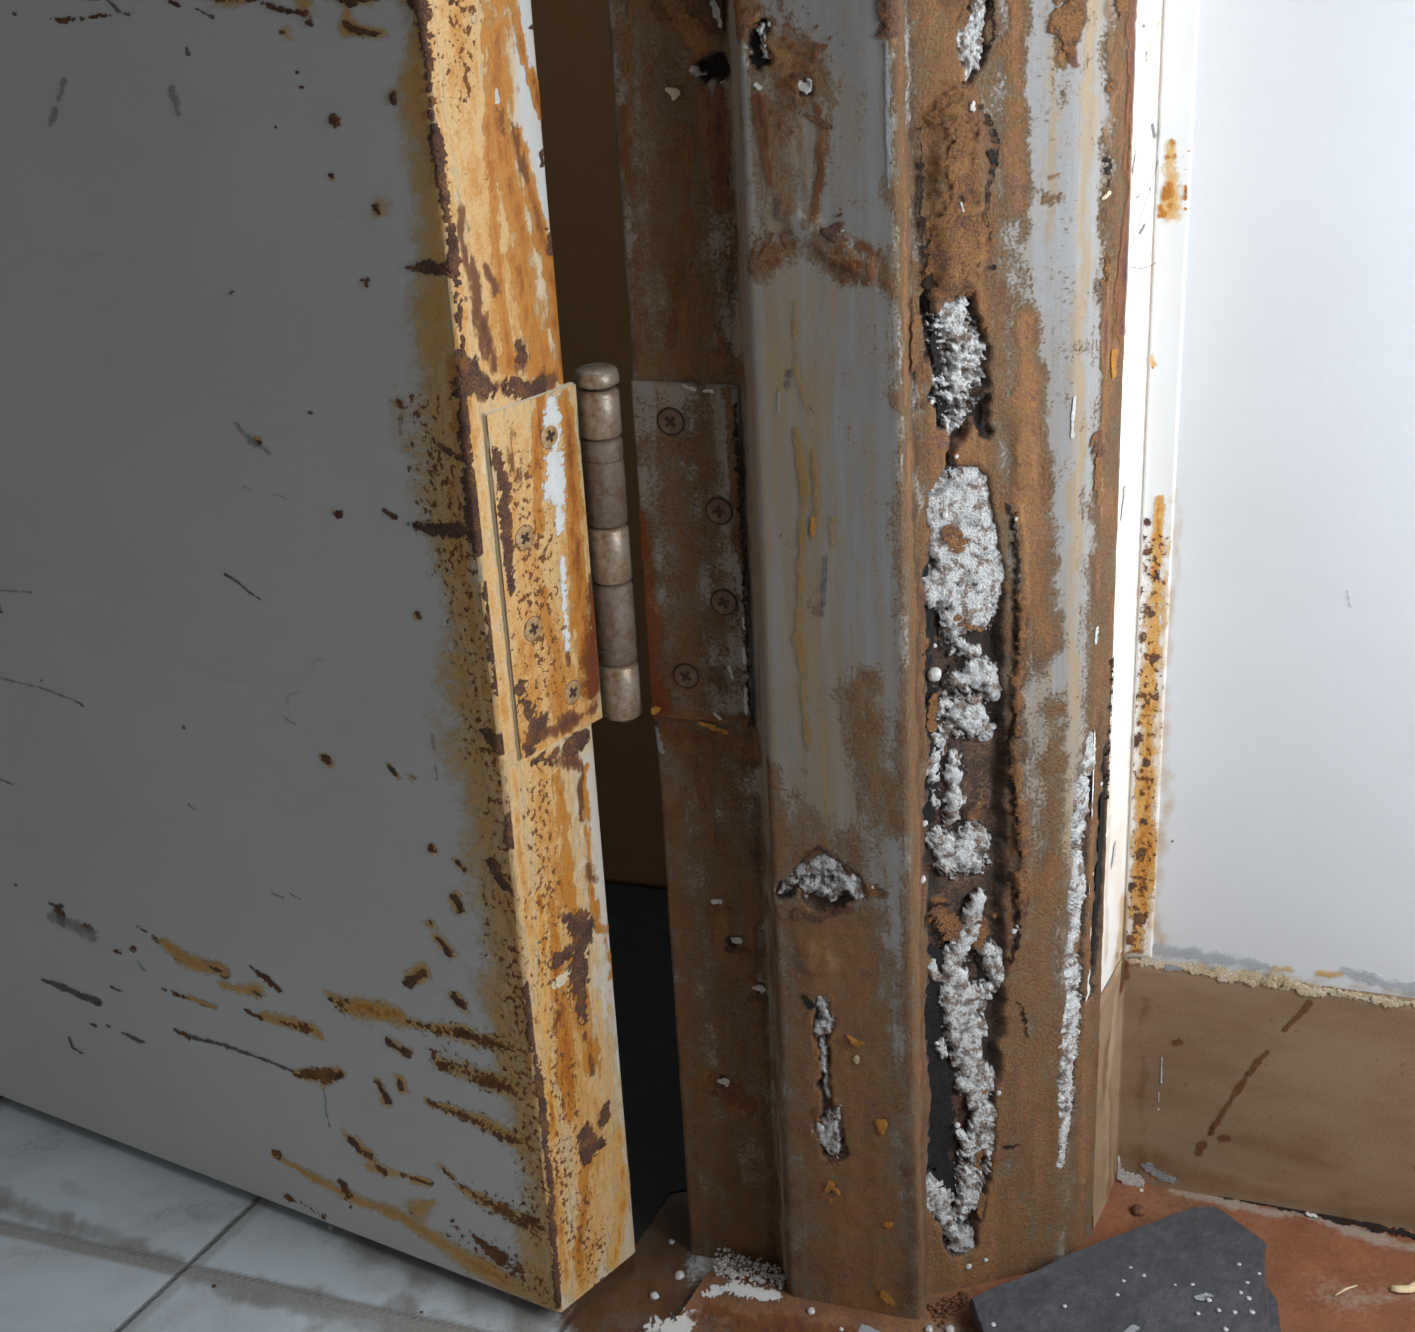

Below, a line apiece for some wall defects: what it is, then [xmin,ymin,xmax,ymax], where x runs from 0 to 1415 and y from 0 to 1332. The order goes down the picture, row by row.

rust [215,0,314,38]
rust [649,0,900,300]
rust [910,81,1000,411]
rust [1047,0,1085,68]
rust [1090,0,1138,504]
rust [1158,139,1190,220]
rust [271,0,702,1332]
rust [1120,495,1171,993]
peeling [1125,957,1415,1008]